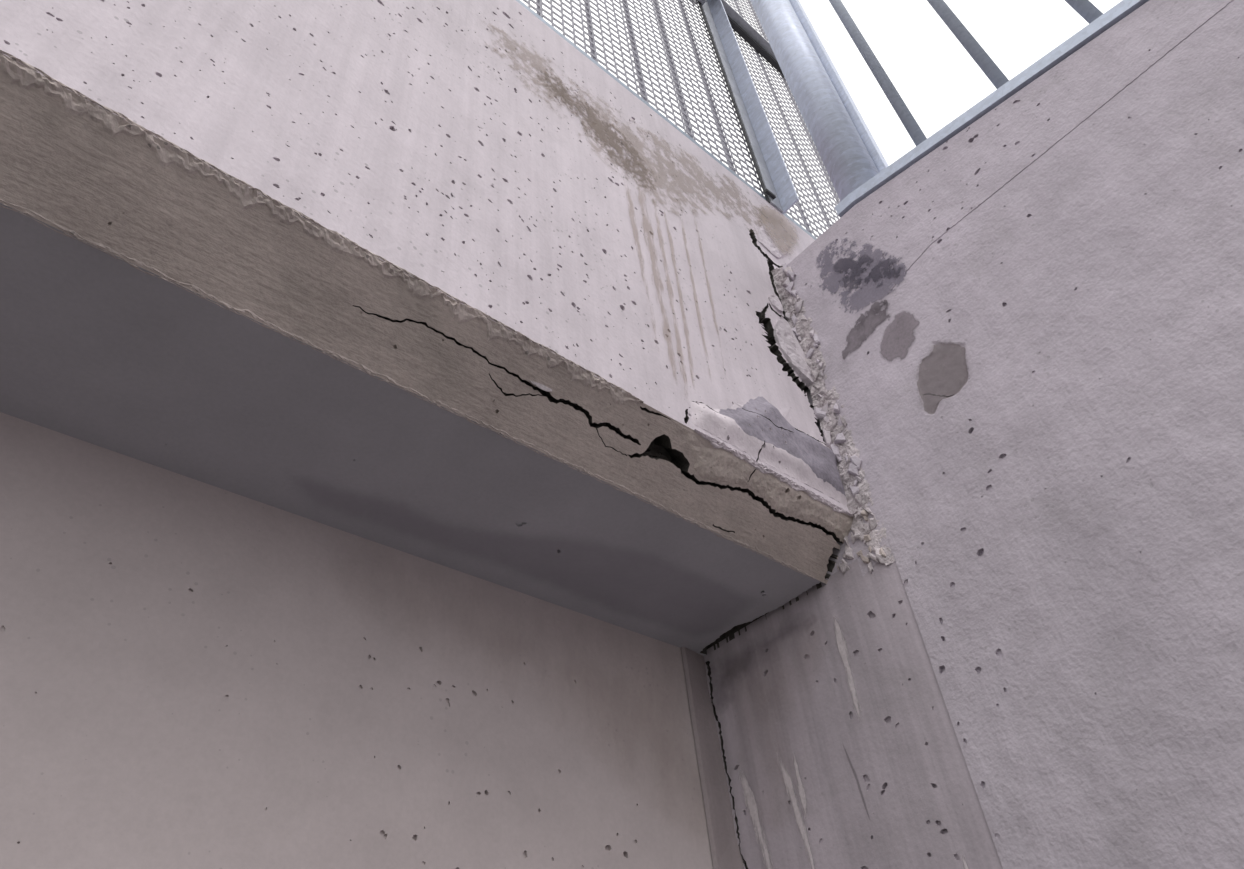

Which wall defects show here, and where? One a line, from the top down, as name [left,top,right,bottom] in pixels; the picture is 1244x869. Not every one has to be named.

crack [353,229,843,869]
spalling [647,222,895,574]
spalling [817,238,919,361]
peeling [917,343,968,415]